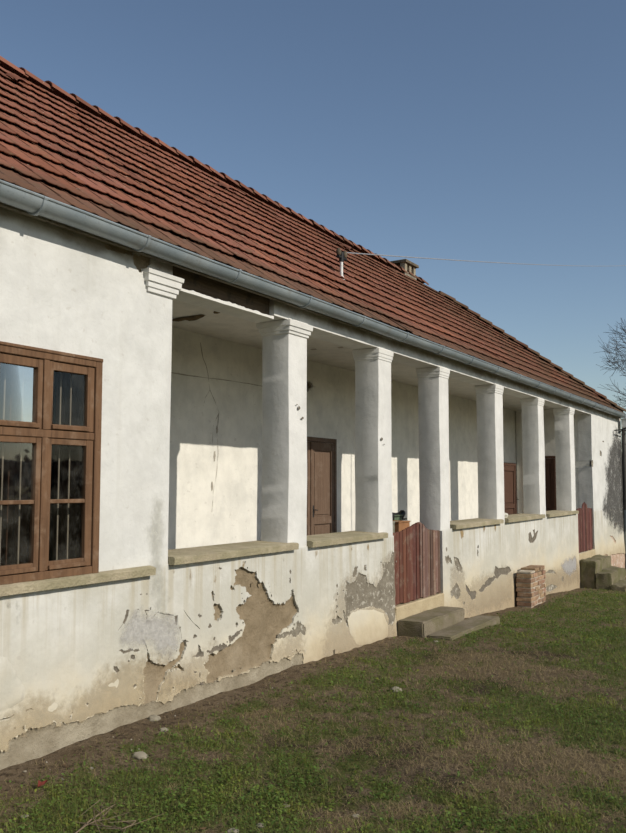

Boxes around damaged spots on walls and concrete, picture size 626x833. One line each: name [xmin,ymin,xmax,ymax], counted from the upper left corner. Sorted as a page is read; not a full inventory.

flaking render [172,311,220,322]
flaking render [178,268,270,315]
crack [171,342,260,507]
leakage [603,431,624,531]
flaking render [332,552,397,627]
flaking render [445,547,462,573]
flaking render [450,566,511,604]
flaking render [0,567,306,770]